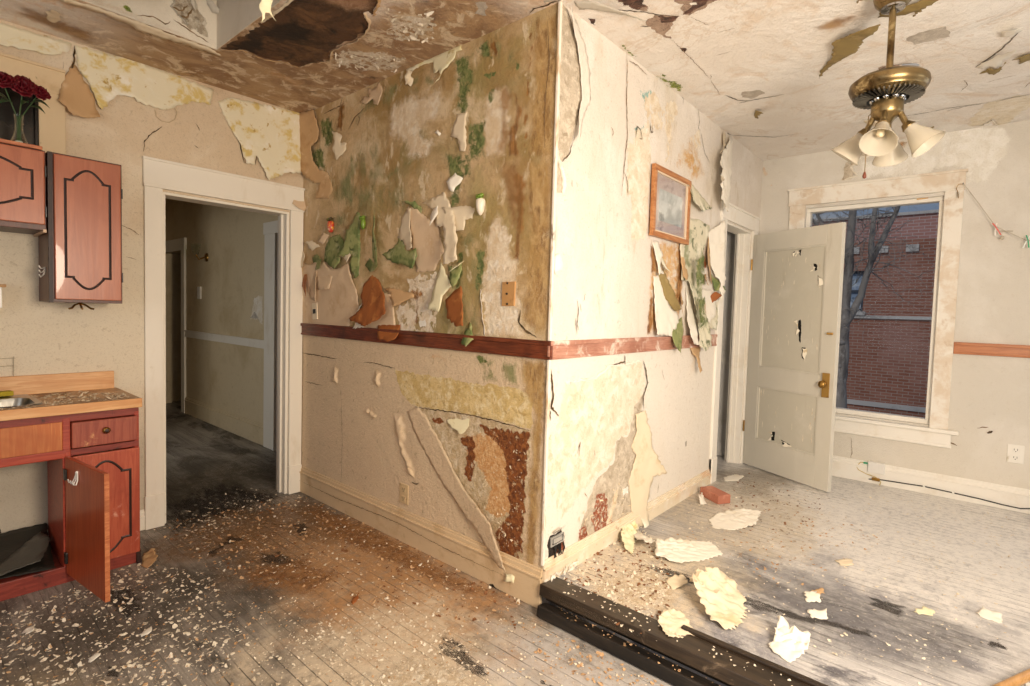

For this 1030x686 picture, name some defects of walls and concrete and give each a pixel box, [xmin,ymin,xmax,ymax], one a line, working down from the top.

water stain [9,4,99,45]
peeling [170,0,208,37]
spalling [618,0,717,52]
spalling [221,0,442,164]
peeling [483,86,512,159]
peeling [543,0,582,195]
crack [907,33,1028,116]
peeling [626,92,706,345]
peeling [353,261,464,332]
peeling [480,214,528,337]
spalling [395,357,650,565]
peeling [544,560,579,582]